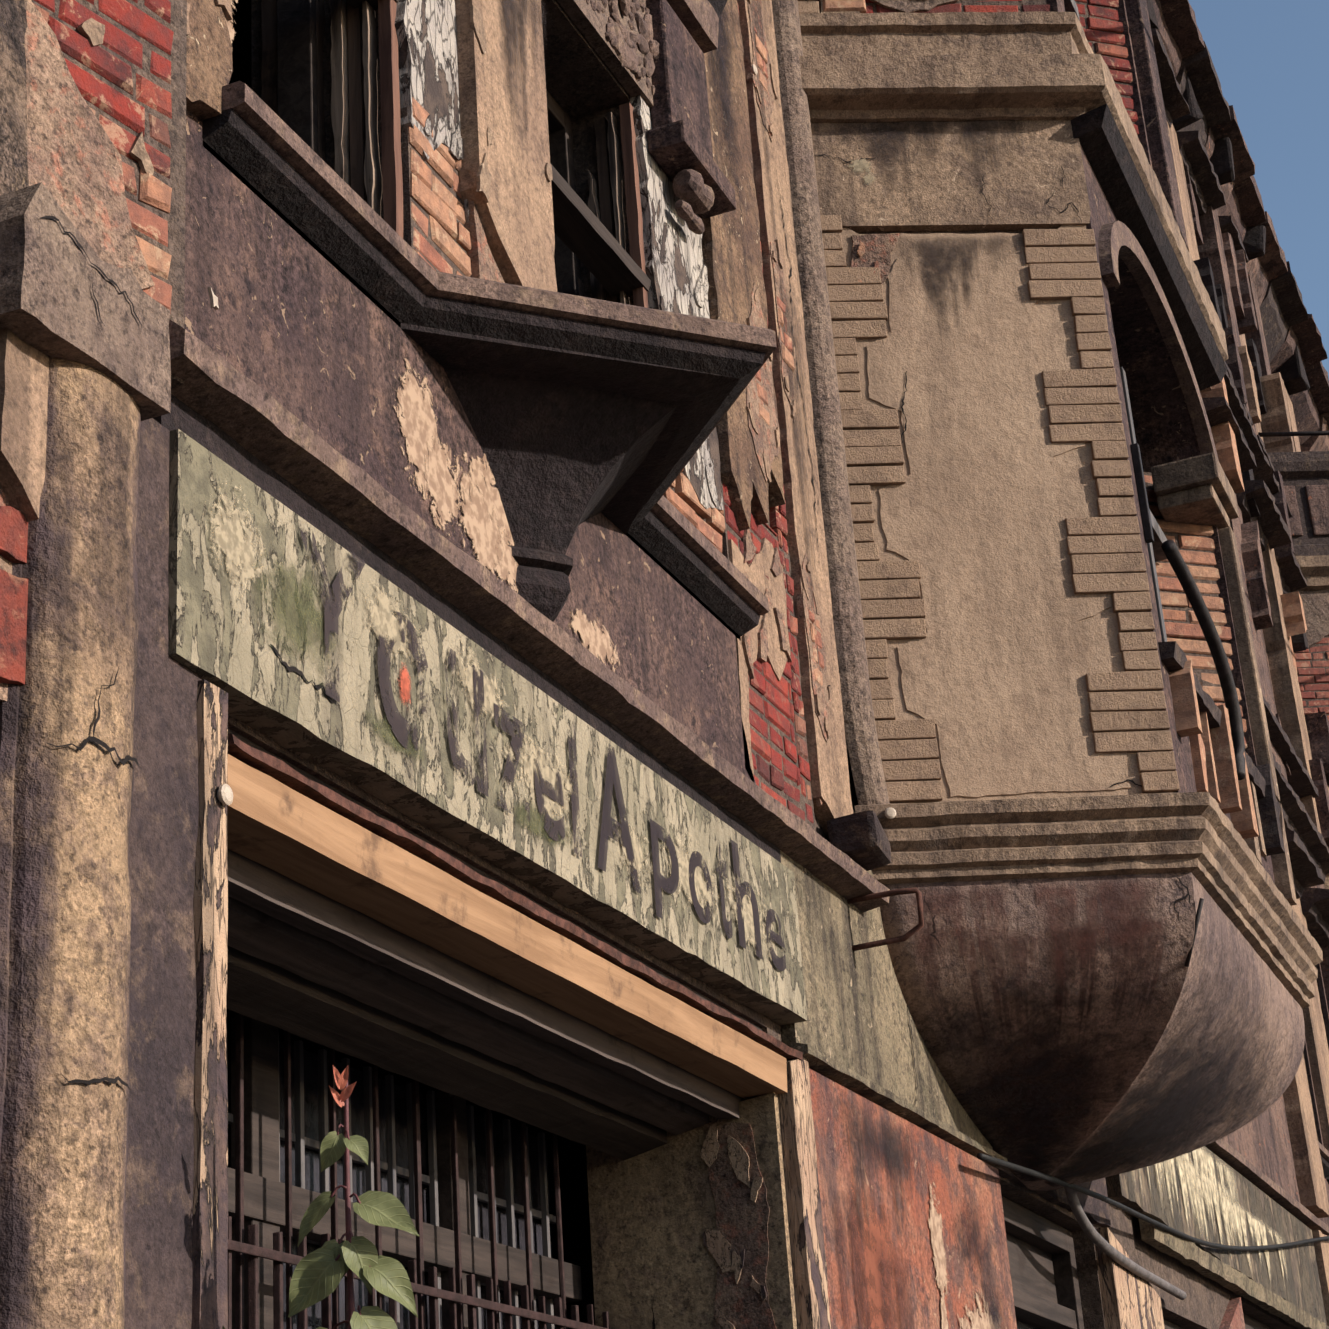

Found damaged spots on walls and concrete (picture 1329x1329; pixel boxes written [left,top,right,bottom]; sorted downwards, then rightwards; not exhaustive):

peeling [214,0,238,43]
flaking render [798,0,898,14]
flaking render [914,0,1050,13]
flaking render [24,0,190,328]
peeling [208,286,219,310]
flaking render [171,375,184,389]
peeling [393,358,519,593]
flaking render [663,239,891,871]
peeling [570,608,620,673]
crack [46,668,139,766]
flaking render [700,1120,777,1329]
rust [837,1192,914,1329]